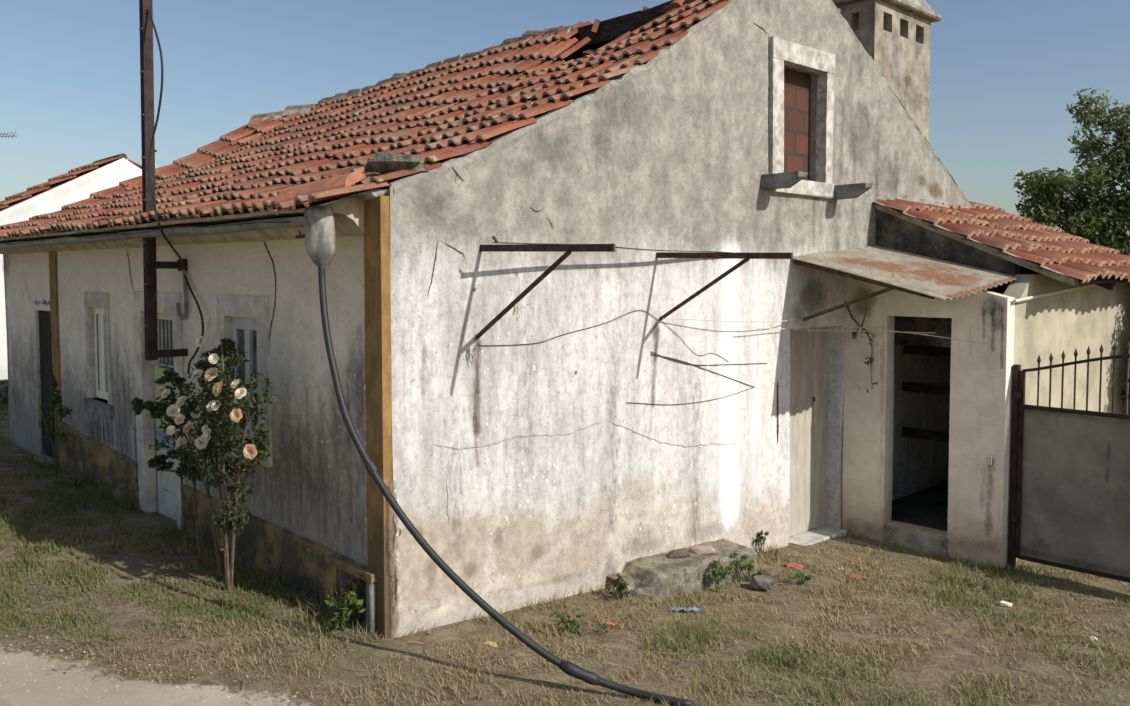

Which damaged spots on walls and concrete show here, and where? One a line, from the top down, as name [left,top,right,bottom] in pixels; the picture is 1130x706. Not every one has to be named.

corrosion [844,257,1013,298]